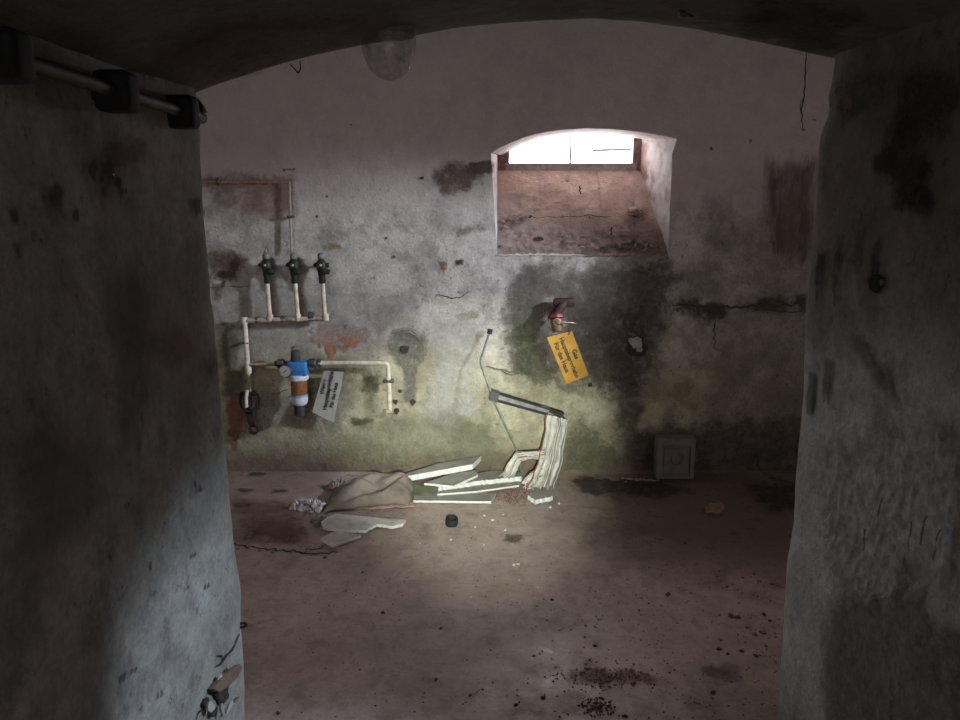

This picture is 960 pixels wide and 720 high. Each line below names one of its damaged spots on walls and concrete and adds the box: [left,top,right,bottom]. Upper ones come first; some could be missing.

crack [799,52,807,131]
leakage [752,249,840,313]
spalling [621,332,649,361]
crack [672,299,801,351]
leakage [502,259,830,499]
crack [234,543,335,556]
spalling [202,665,242,717]